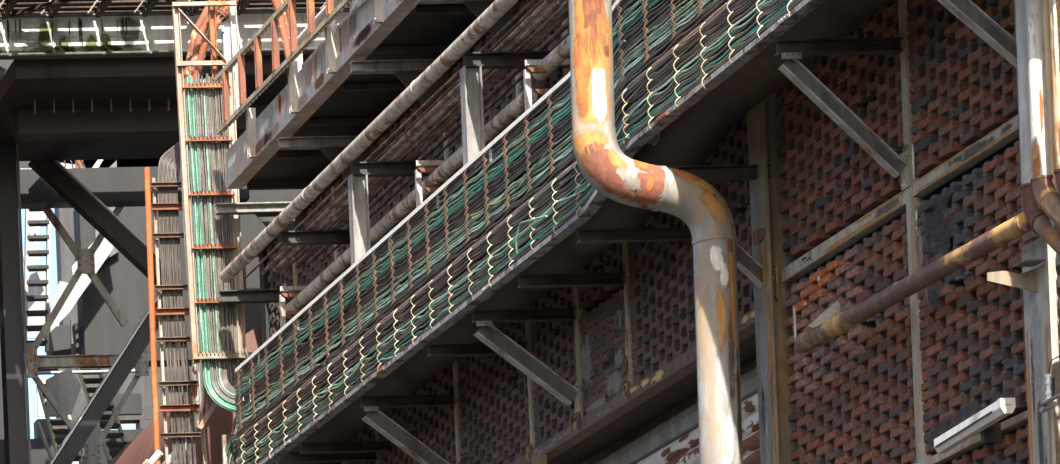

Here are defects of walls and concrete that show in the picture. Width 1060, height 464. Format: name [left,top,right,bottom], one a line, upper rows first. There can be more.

rust [298,53,324,108]
rust [572,0,729,223]
peeling [710,245,729,288]
peeling [714,322,729,403]
peeling [724,417,734,464]